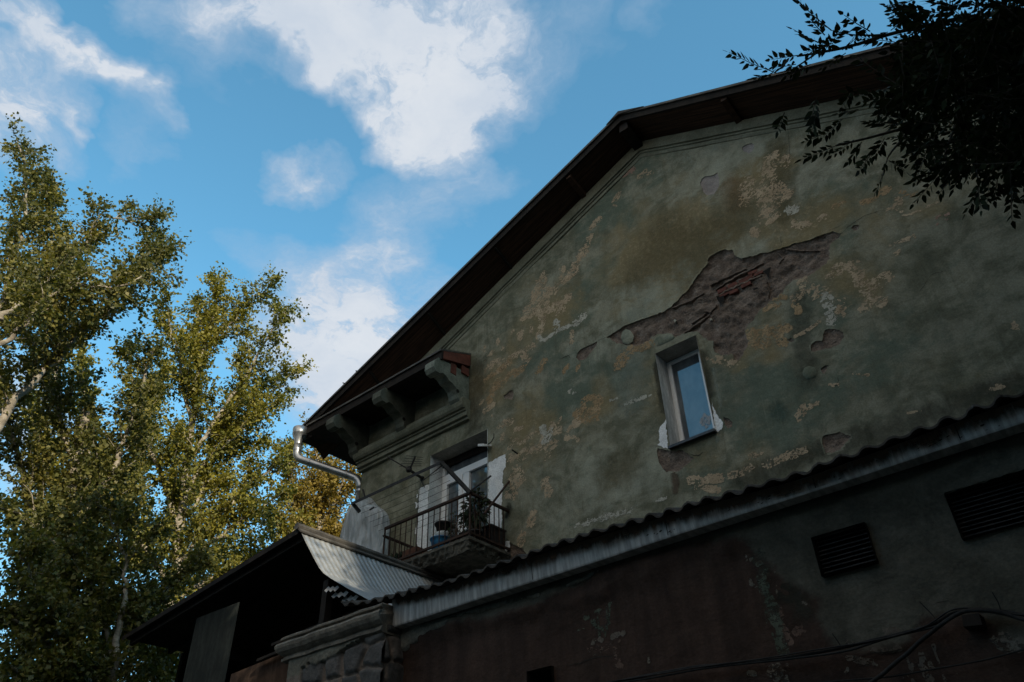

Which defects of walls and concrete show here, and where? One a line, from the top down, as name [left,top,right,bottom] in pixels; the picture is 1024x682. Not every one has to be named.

spalling [484,150,895,376]
peeling [479,388,652,501]
peeling [657,446,808,494]